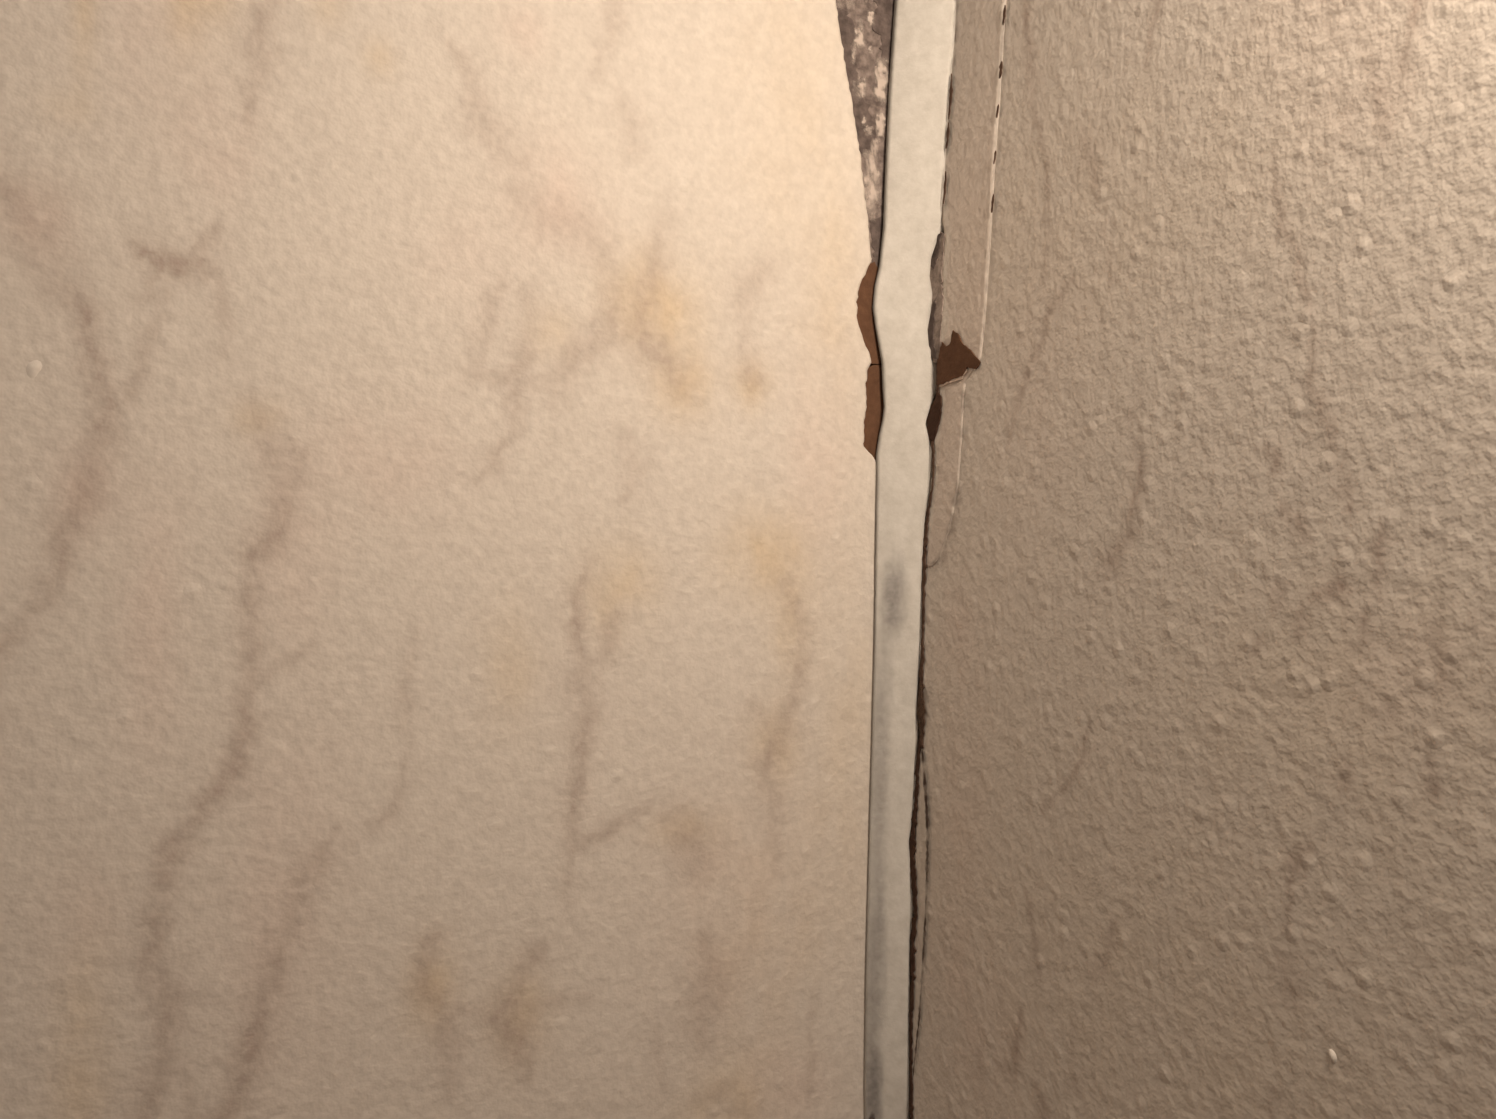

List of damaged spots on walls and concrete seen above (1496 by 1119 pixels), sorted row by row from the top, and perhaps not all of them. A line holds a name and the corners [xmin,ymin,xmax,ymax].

crack [943,74,953,204]
crack [991,61,1003,213]
crack [933,359,941,392]
crack [869,440,935,1119]